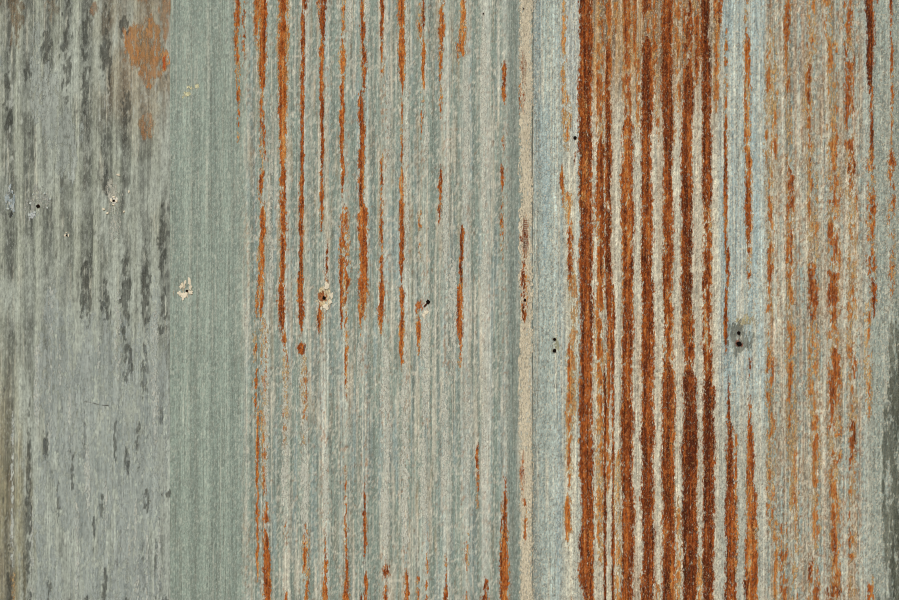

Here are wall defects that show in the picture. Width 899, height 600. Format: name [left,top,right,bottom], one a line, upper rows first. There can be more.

rust [122,14,170,89]
rust [416,0,426,139]
rust [438,0,446,119]
rust [455,0,467,65]
rust [325,0,385,396]
rust [396,0,407,365]
rust [234,0,327,600]
rust [456,225,465,367]
rust [559,0,896,600]
rust [342,466,350,600]
rust [404,554,429,600]
rust [482,477,510,600]